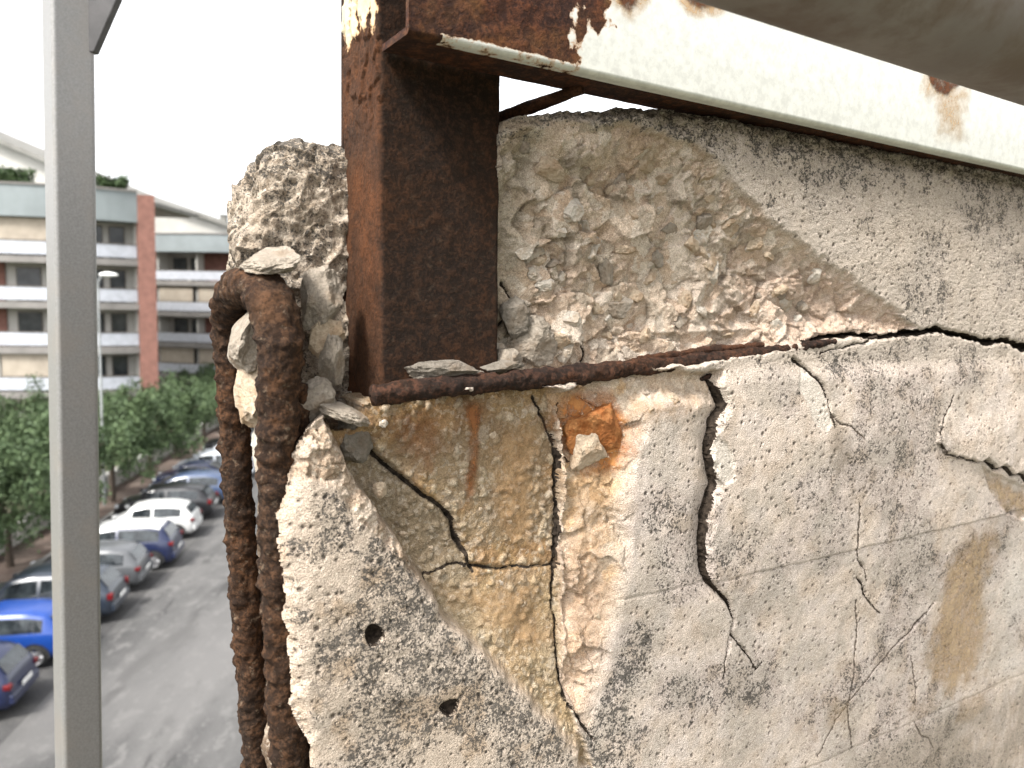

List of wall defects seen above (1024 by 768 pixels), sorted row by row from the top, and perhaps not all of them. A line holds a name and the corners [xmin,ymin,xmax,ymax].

rust [929,76,959,129]
rust [296,382,310,443]
rust [561,394,626,446]
spalling [287,107,915,768]
rust [596,438,627,471]
rust [636,342,765,358]
crack [791,325,1024,438]
crack [939,395,1024,482]
spalling [276,496,290,639]
crack [370,395,596,742]
crack [696,379,762,679]
leakage [931,536,993,688]